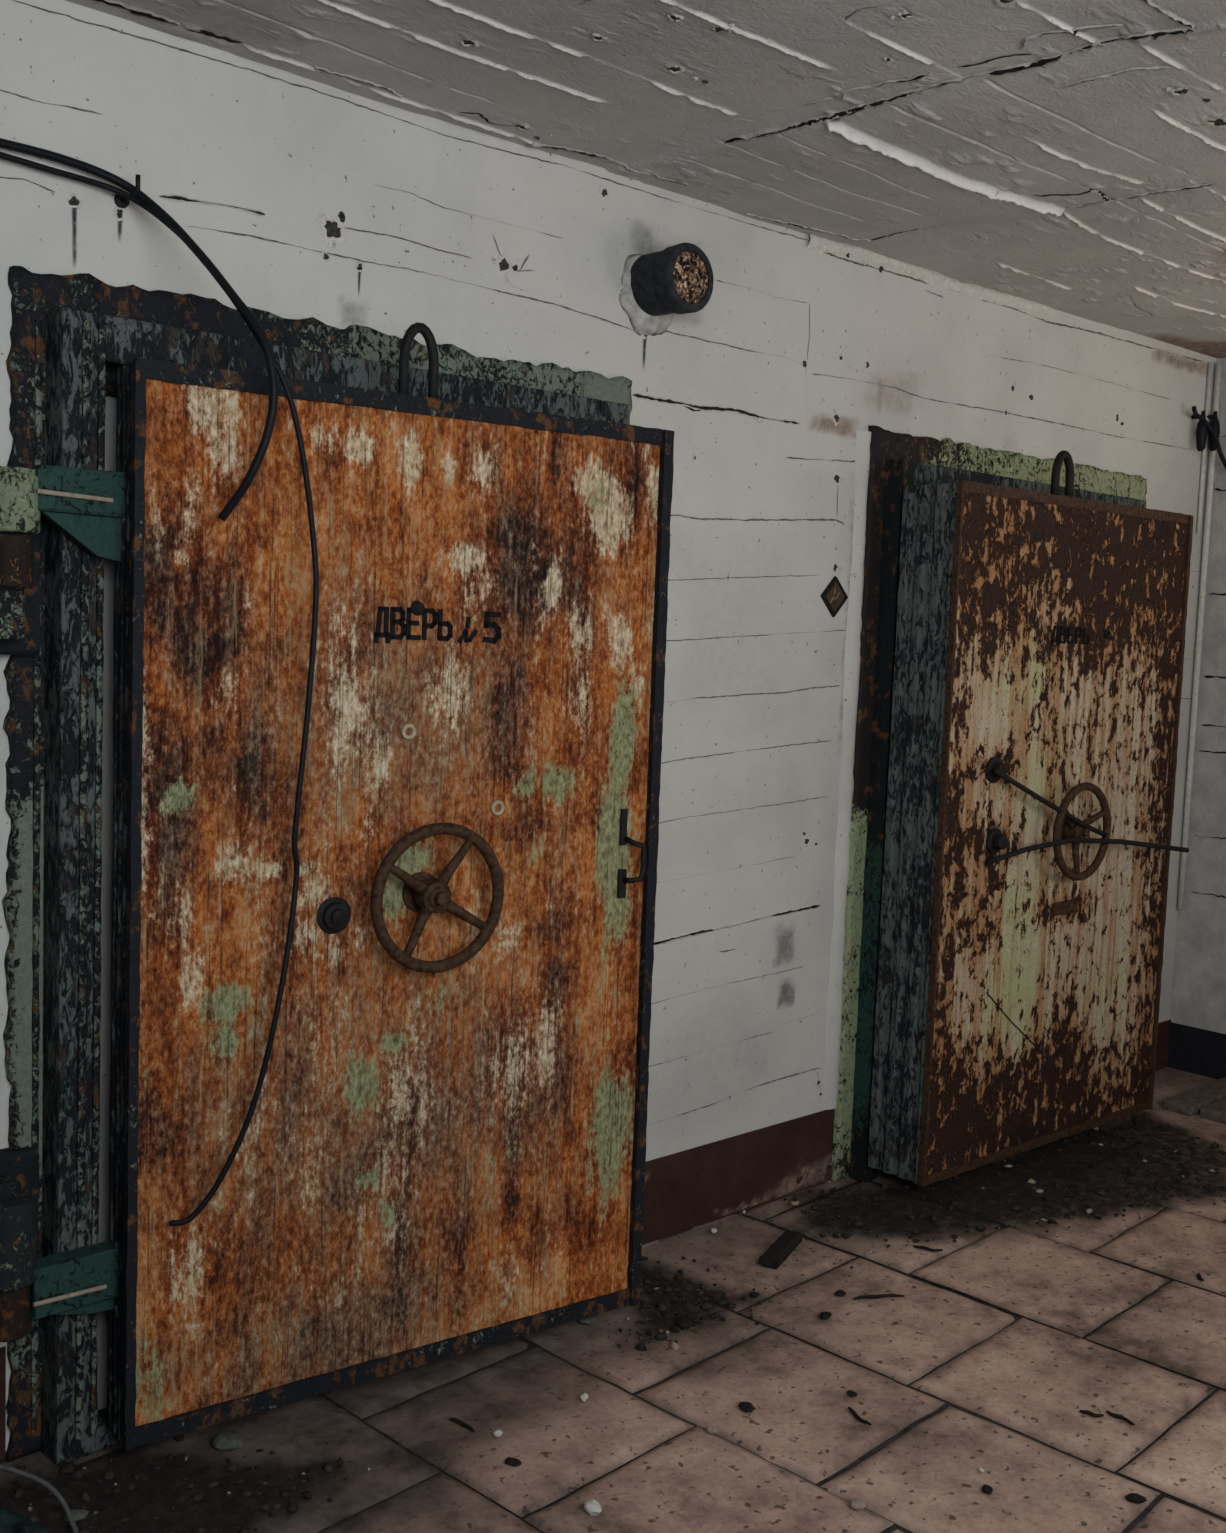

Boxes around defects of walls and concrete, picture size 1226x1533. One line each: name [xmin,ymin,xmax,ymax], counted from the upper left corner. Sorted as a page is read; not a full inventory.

crack [0,0,1226,362]
crack [668,574,815,582]
crack [666,630,845,641]
crack [670,685,841,706]
crack [661,741,827,764]
crack [659,797,822,824]
crack [651,904,820,1005]